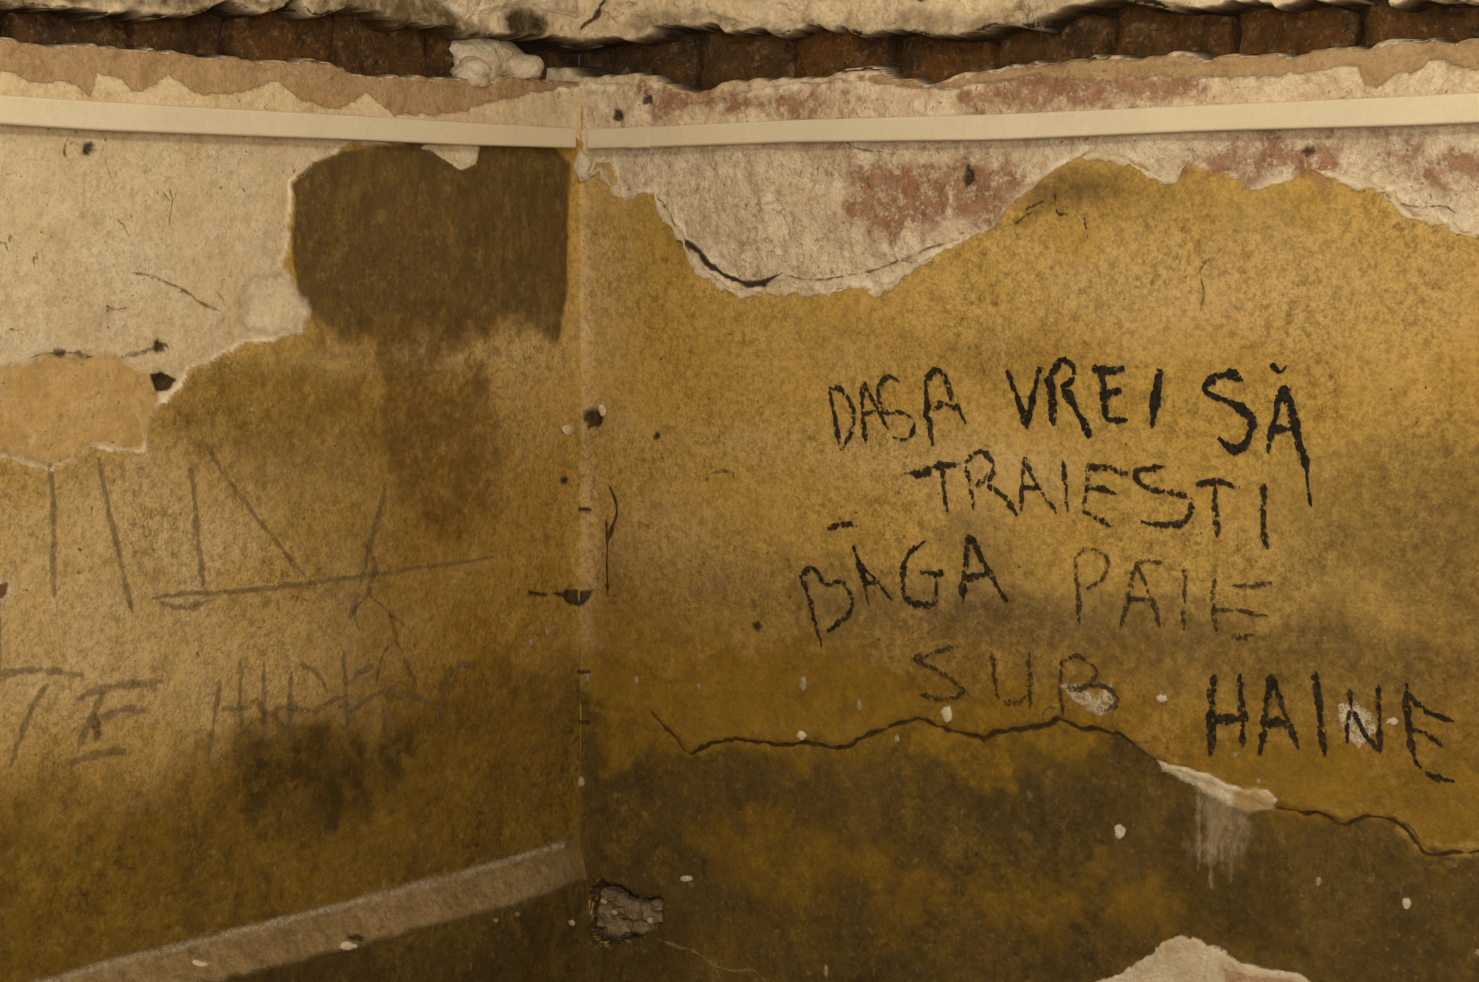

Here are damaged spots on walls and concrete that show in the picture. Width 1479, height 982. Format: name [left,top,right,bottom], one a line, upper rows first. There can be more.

peeling [0,0,1479,299]
peeling [0,125,403,472]
water stain [293,143,570,528]
spalling [562,404,606,435]
peeling [0,578,13,601]
peeling [1061,684,1114,715]
water stain [0,645,1479,982]
crack [647,706,1155,835]
peeling [1157,760,1277,811]
crack [1275,807,1479,865]
spalling [568,879,664,943]
peeling [1096,935,1310,982]